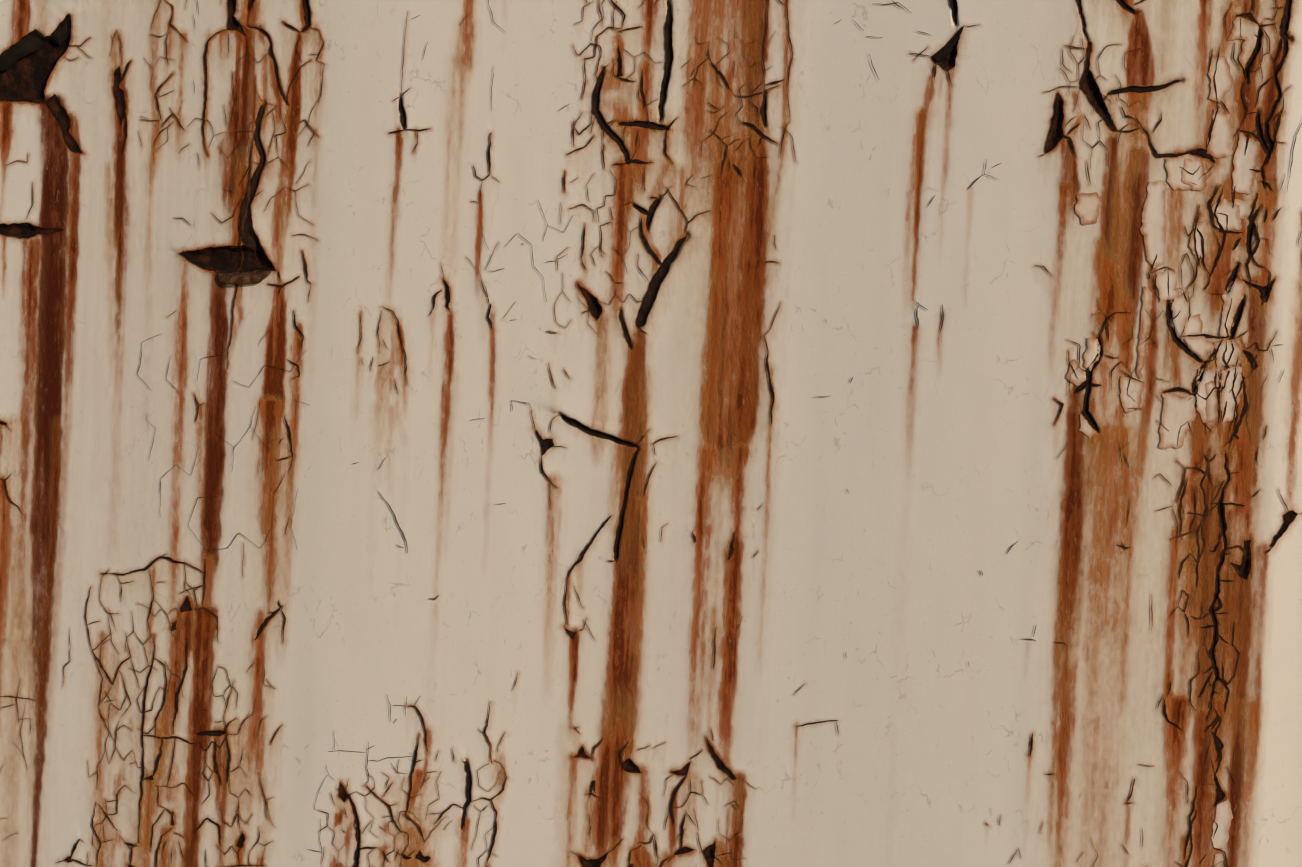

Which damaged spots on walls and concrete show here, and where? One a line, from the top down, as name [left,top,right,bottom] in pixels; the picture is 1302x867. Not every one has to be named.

corrosion [0,96,81,867]
peeling [0,13,91,155]
corrosion [141,0,311,867]
peeling [178,0,300,374]
corrosion [566,331,678,867]
crack [466,0,796,640]
peeling [627,728,737,867]
corrosion [597,0,789,867]
crack [713,618,742,669]
crack [834,0,957,79]
corrosion [1050,0,1184,863]
peeling [1040,0,1295,449]